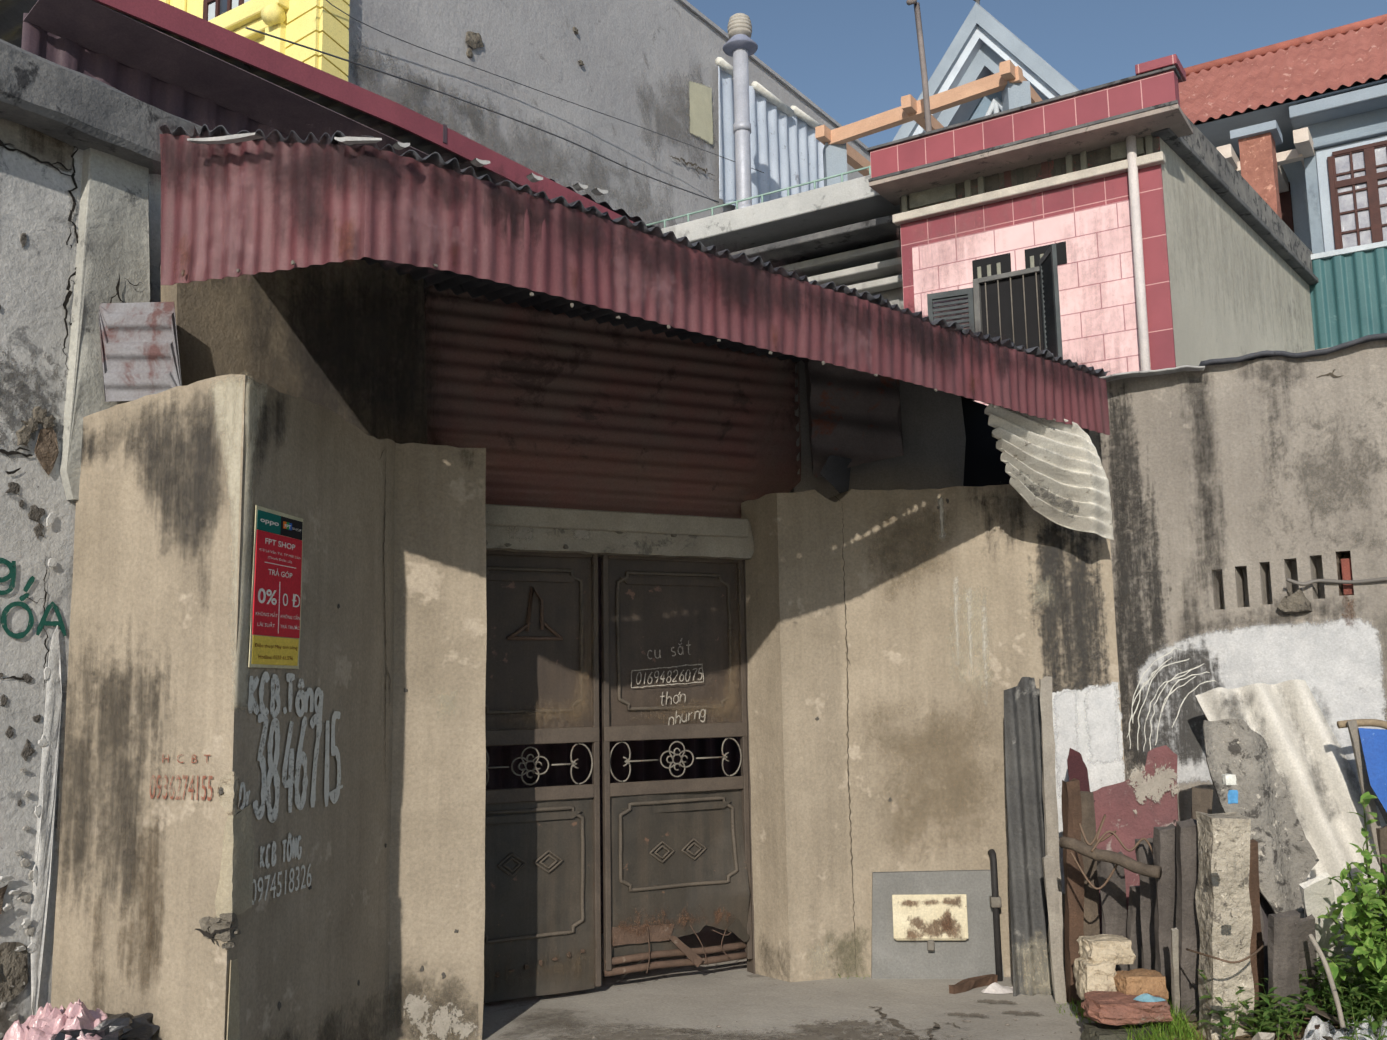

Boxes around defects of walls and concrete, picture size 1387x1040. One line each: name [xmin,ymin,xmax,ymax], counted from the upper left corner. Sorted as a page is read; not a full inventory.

leakage [0,349,68,456]
crack [0,140,78,371]
crack [110,275,141,303]
leakage [150,377,266,707]
leakage [1013,384,1171,775]
peeling [0,625,62,1039]
leakage [56,657,162,980]